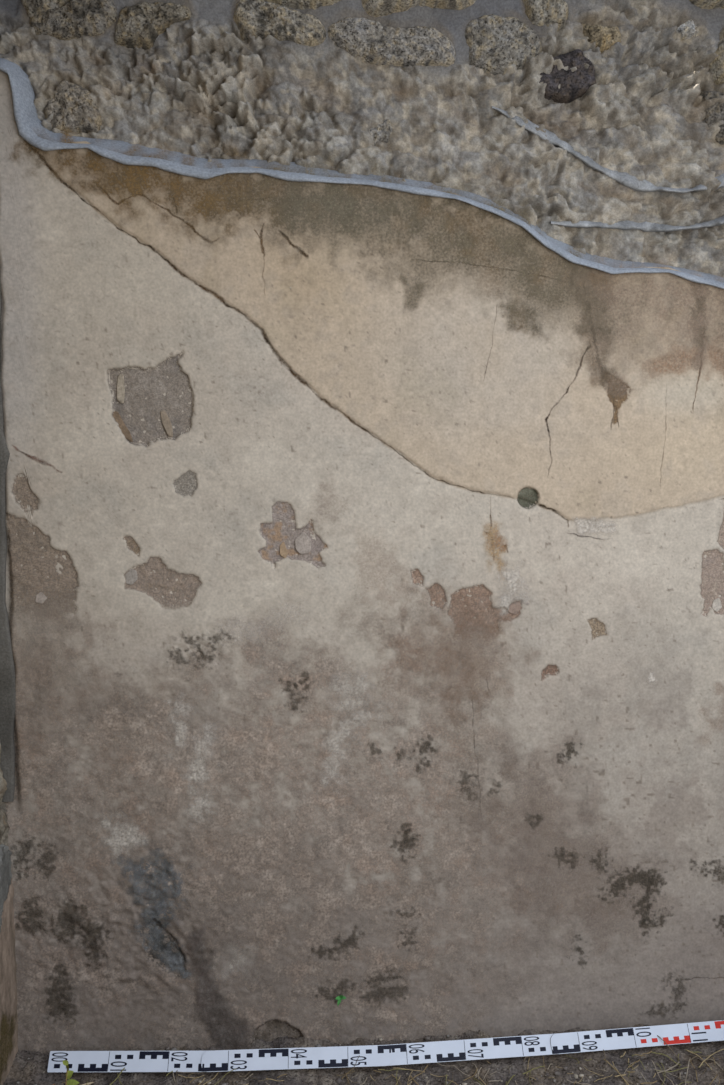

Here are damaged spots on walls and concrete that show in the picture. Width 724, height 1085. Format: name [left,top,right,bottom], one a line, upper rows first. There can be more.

leakage [14,130,724,395]
spalling [108,354,193,447]
crack [29,145,508,556]
crack [566,327,604,393]
spalling [6,474,79,611]
spalling [124,536,202,607]
spalling [259,502,327,567]
spalling [412,569,522,635]
spalling [701,520,724,616]
leakage [6,618,667,1054]